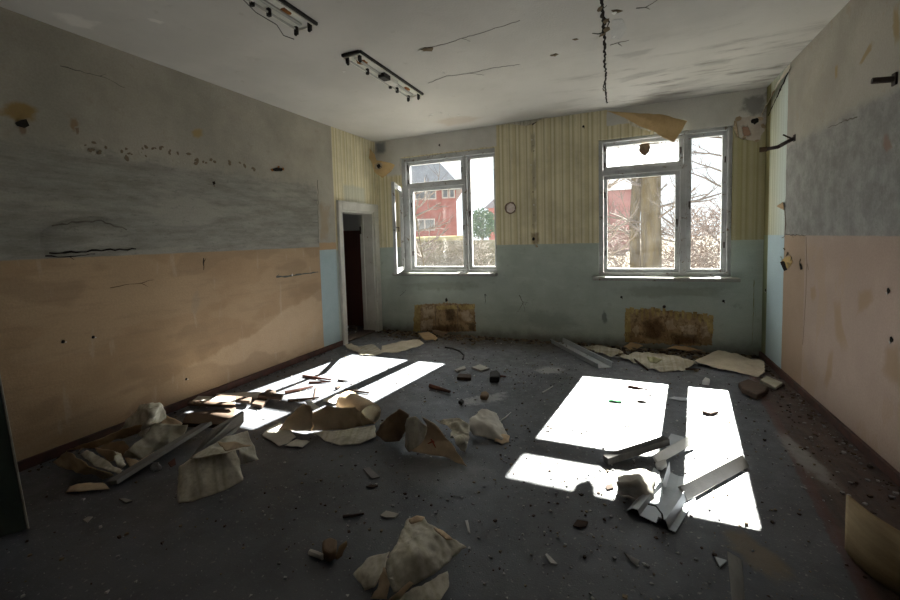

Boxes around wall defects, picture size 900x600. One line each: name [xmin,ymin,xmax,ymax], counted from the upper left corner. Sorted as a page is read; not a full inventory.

corrosion [0,98,47,138]
crack [276,271,316,279]